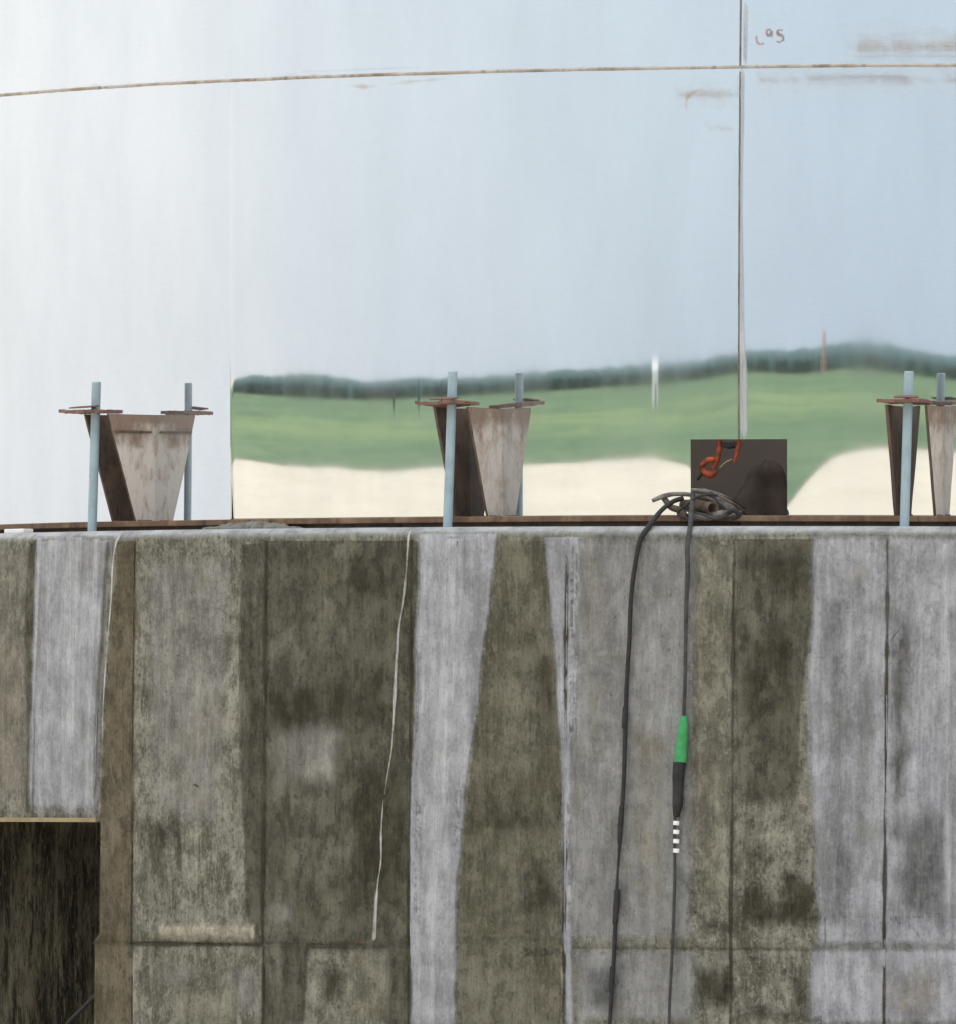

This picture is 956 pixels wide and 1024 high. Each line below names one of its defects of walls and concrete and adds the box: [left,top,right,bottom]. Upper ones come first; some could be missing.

water stain [0,534,141,1024]
water stain [152,564,224,822]
water stain [159,967,248,1022]
water stain [239,530,956,1024]